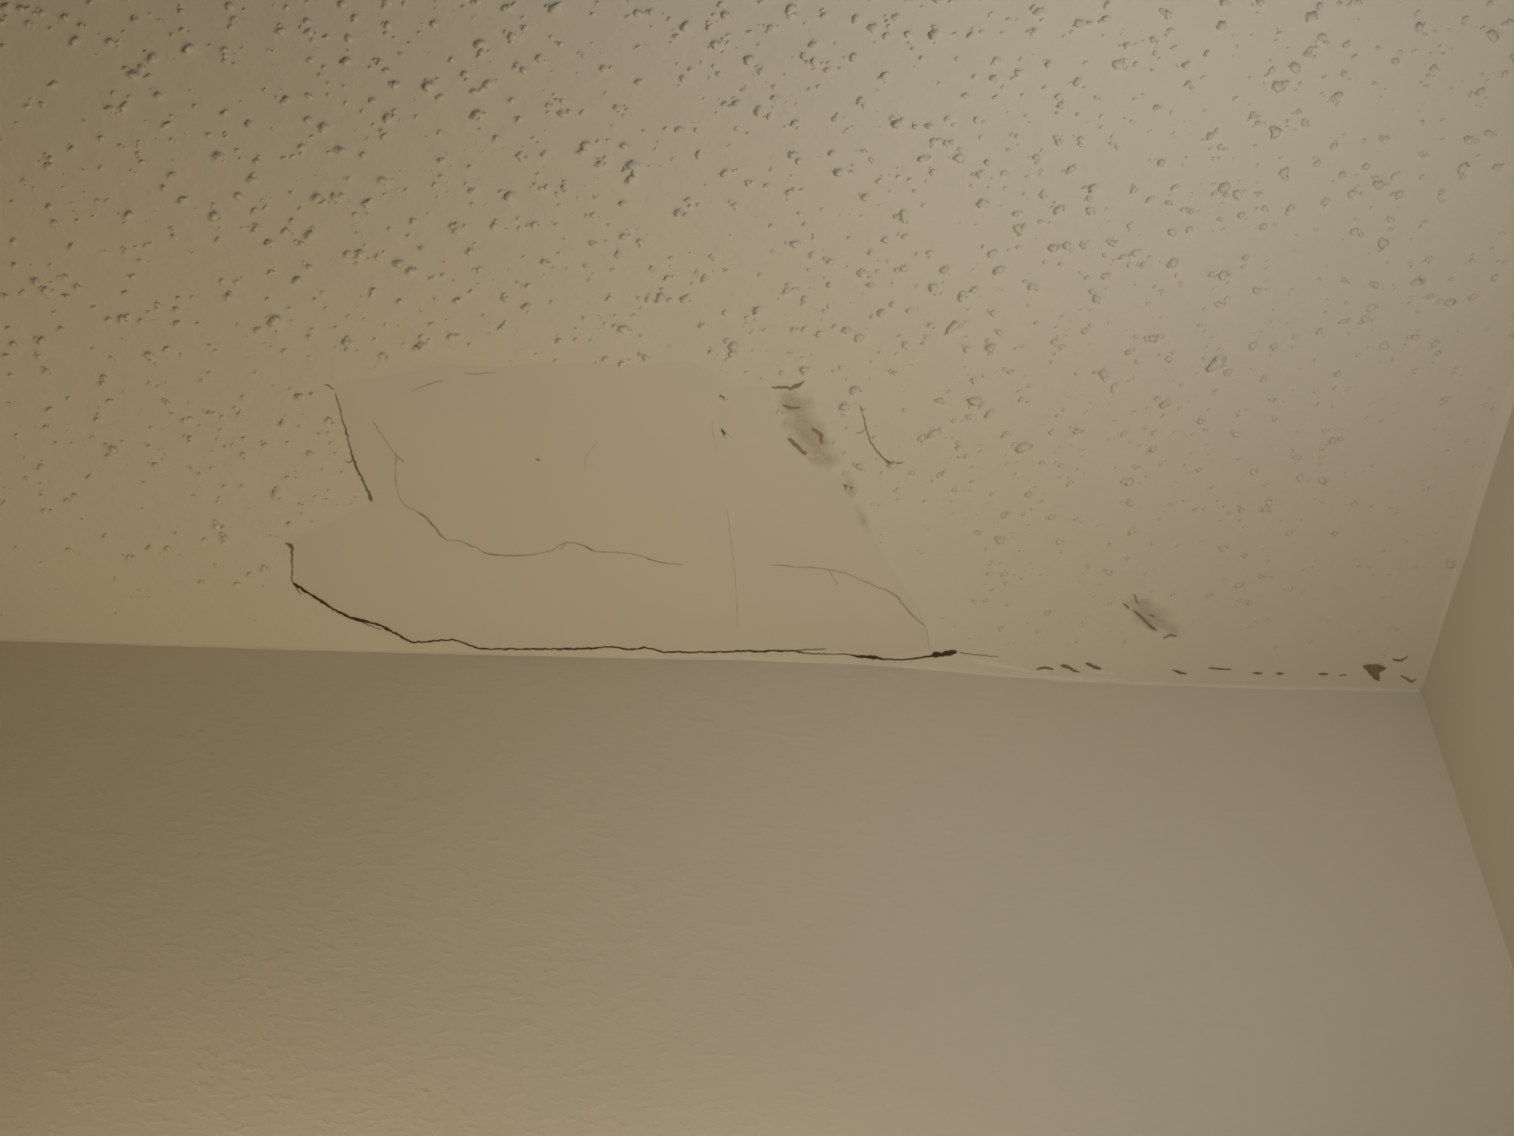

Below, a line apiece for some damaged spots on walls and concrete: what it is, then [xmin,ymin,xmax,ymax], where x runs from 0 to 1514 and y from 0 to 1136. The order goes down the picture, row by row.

crack [326,385,682,565]
crack [856,405,904,464]
crack [285,543,998,661]